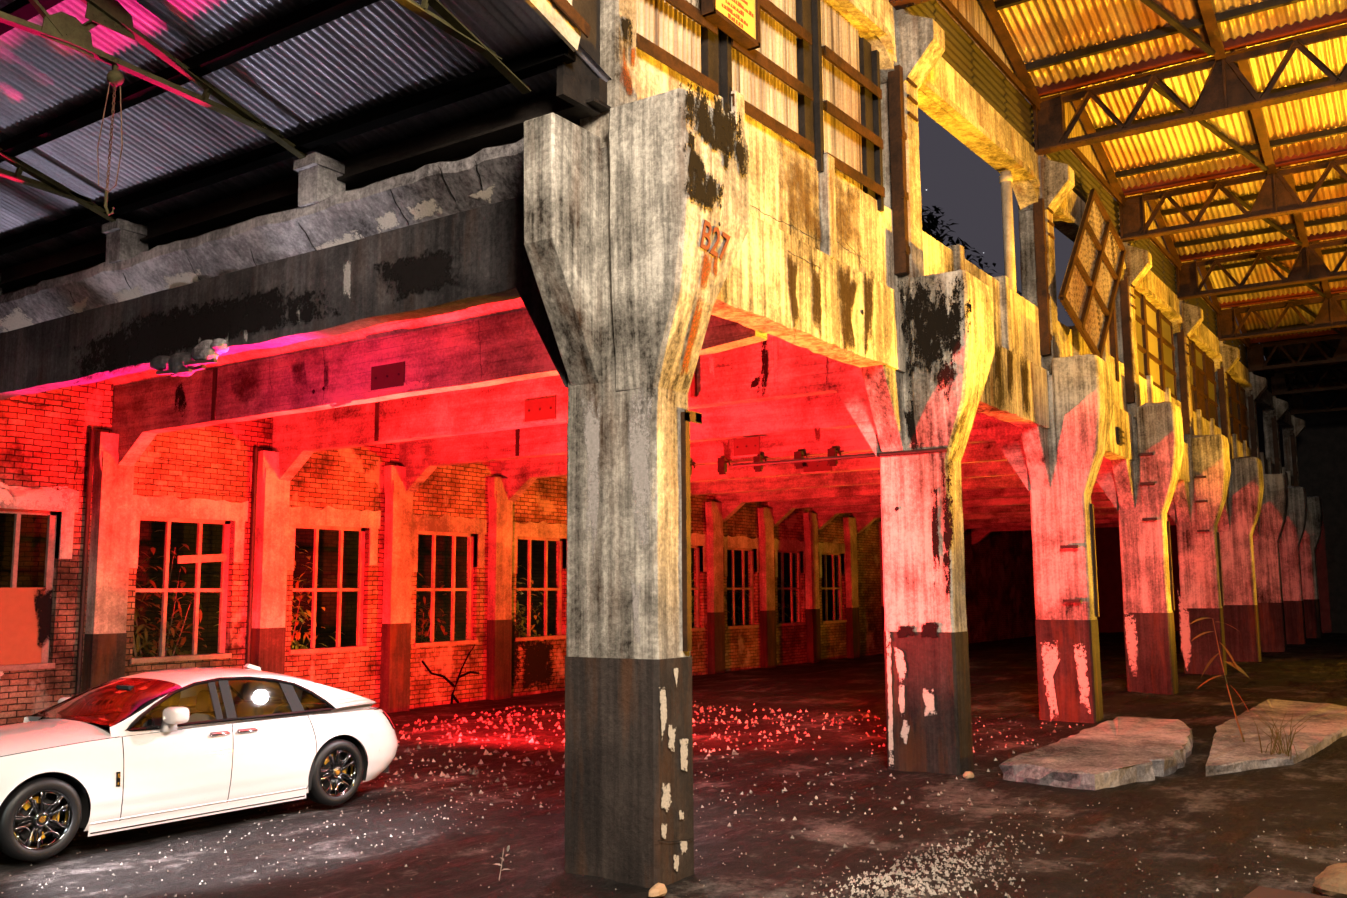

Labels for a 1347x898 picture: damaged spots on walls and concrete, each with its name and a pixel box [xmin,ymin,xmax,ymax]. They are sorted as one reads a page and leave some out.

leakage [678,78,750,214]
leakage [781,138,820,235]
leakage [836,185,857,244]
leakage [787,254,822,337]
leakage [838,265,874,362]
leakage [750,336,778,396]
peeling [0,482,77,511]
peeling [660,668,688,771]
peeling [886,622,939,767]
peeling [1041,642,1091,720]
peeling [661,783,687,871]